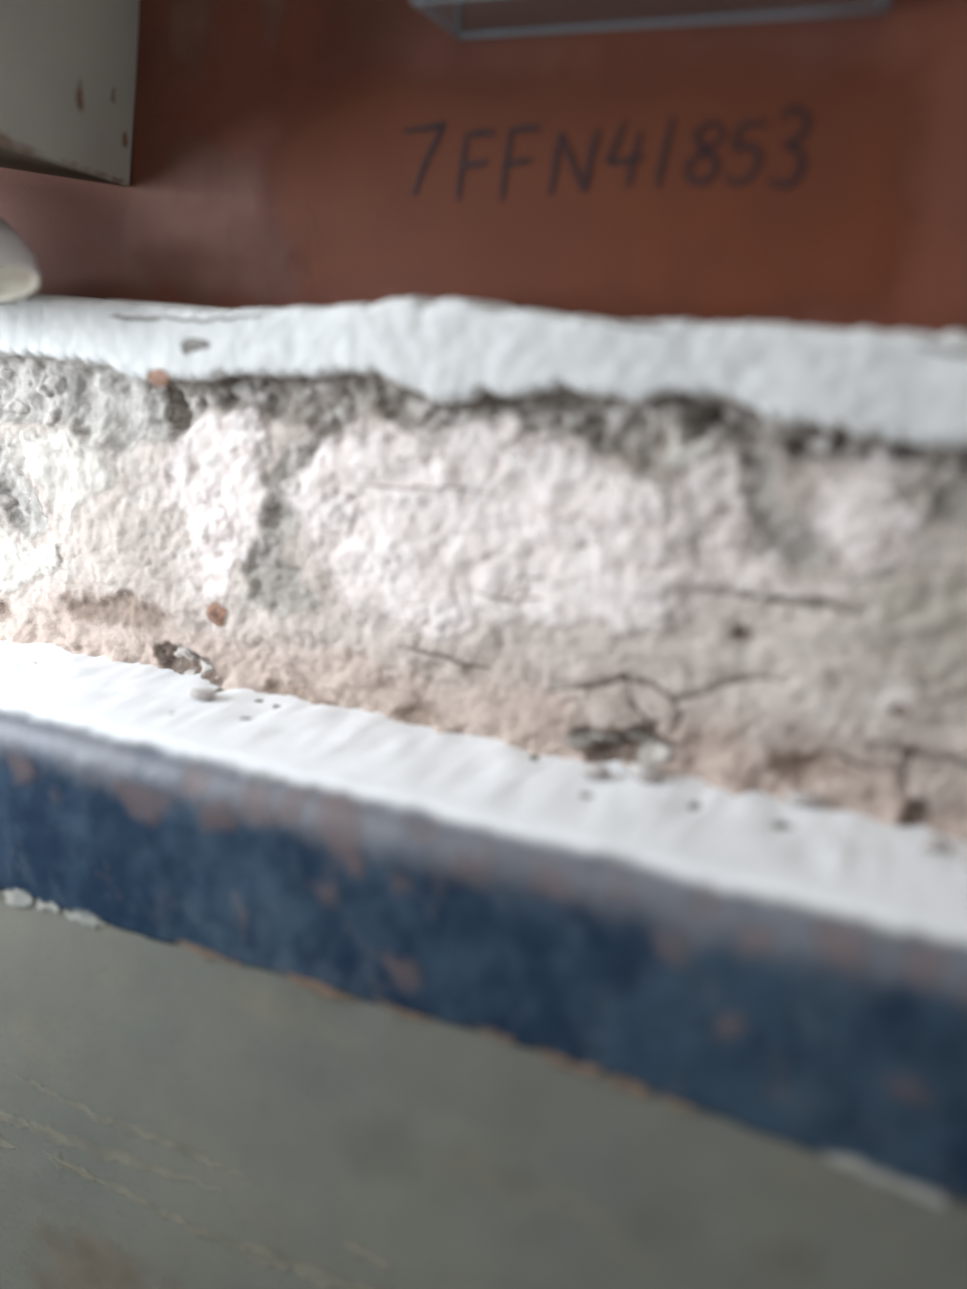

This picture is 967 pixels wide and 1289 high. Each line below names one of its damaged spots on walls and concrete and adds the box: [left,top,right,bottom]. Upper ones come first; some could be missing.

peeling [0,355,967,641]
spalling [153,642,223,685]
spalling [266,680,330,705]
spalling [399,706,439,722]
spalling [891,704,910,718]
spalling [566,723,674,765]
spalling [773,753,837,781]
spalling [899,799,934,827]
peeling [4,889,101,927]